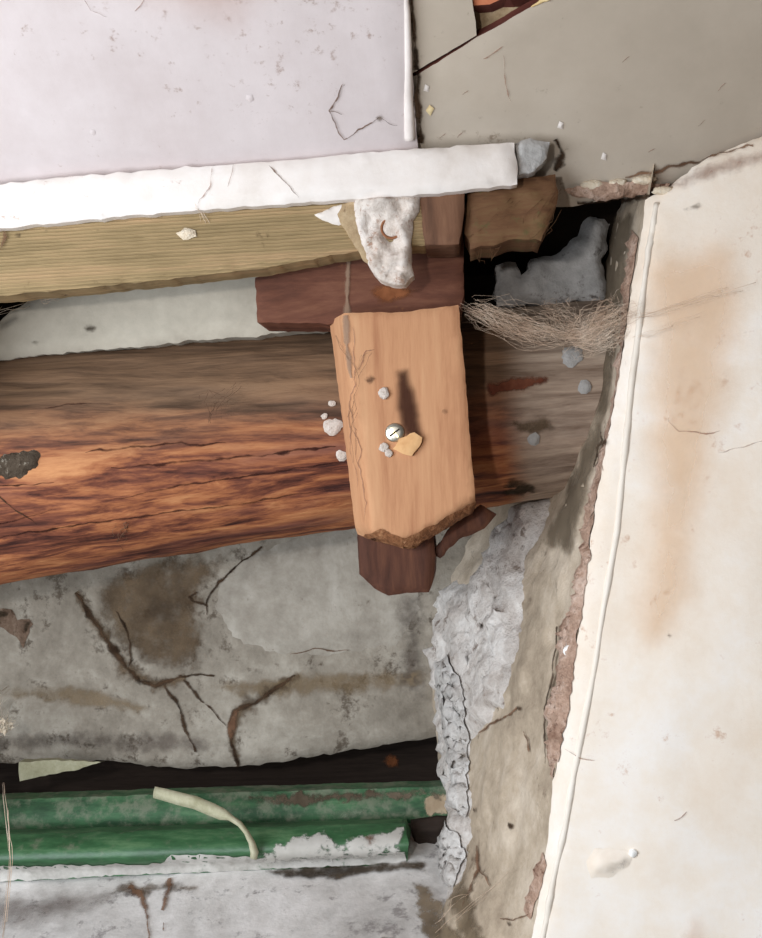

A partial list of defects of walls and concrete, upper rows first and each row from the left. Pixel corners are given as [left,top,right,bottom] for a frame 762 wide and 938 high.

crack [329,0,424,143]
spalling [543,230,638,779]
damp [102,559,214,666]
crack [75,591,343,767]
crack [188,546,262,612]
peeling [153,787,404,863]